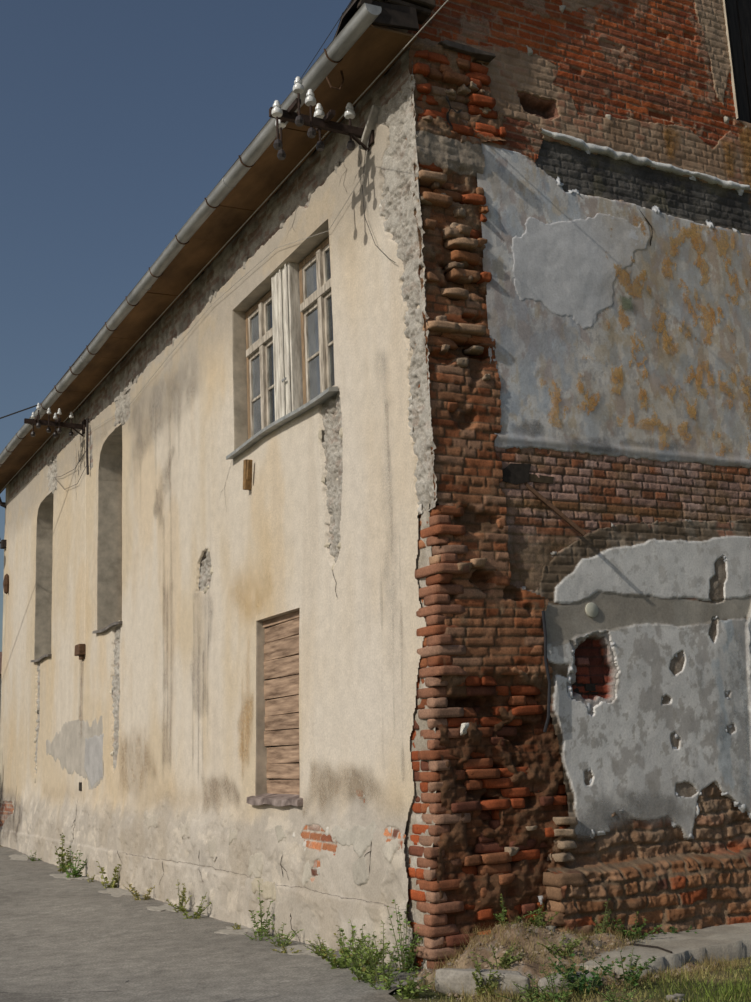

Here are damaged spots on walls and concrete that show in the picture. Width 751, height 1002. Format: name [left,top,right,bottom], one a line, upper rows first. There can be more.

flaking render [499,92,559,162]
flaking render [407,0,747,149]
flaking render [9,47,437,514]
peeling [652,220,747,353]
flaking render [198,548,213,594]
flaking render [318,392,343,570]
spalling [567,631,618,716]
flaking render [494,432,751,591]
flaking render [709,616,718,642]
flaking render [709,556,726,603]
flaking render [275,821,406,886]
flaking render [547,782,751,938]